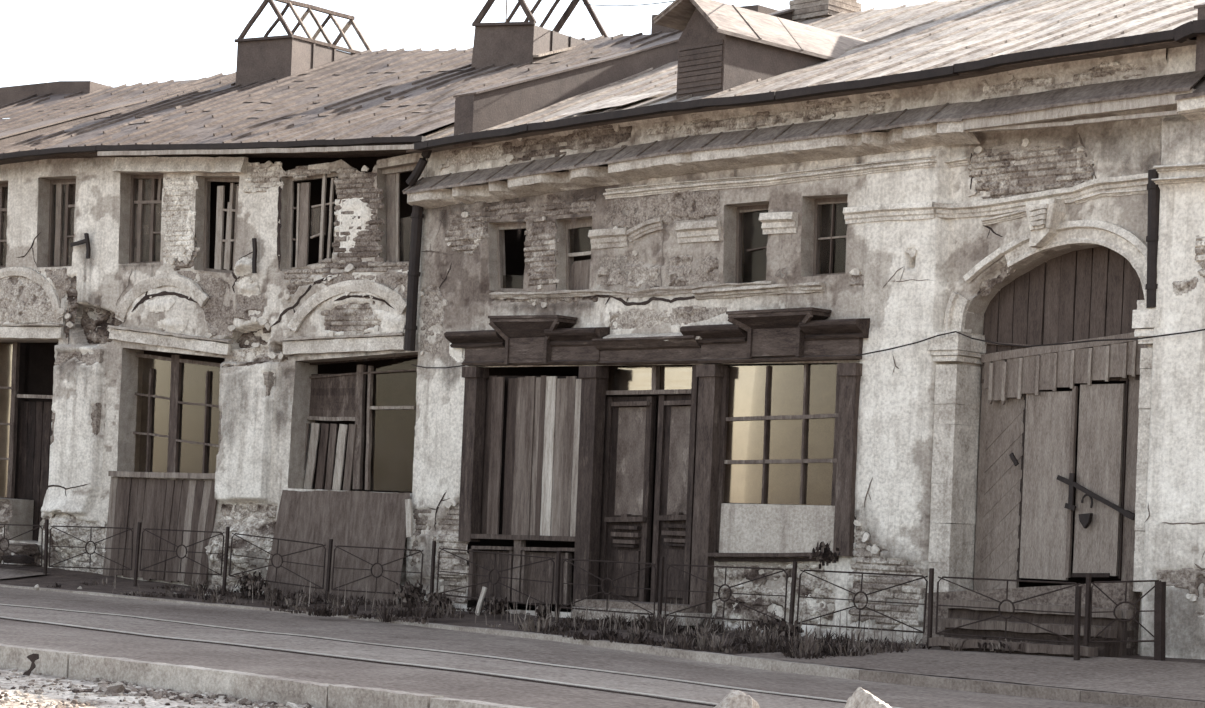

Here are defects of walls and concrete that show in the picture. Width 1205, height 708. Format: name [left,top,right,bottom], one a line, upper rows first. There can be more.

flaking render [968,138,1095,199]
flaking render [0,267,104,365]
crack [116,271,197,319]
flaking render [161,173,288,397]
crack [232,179,282,293]
crack [271,275,394,331]
flaking render [243,161,447,355]
flaking render [445,190,721,308]
flaking render [605,305,727,330]
flaking render [1172,235,1205,295]
flaking render [715,520,926,631]
crack [1145,504,1205,578]